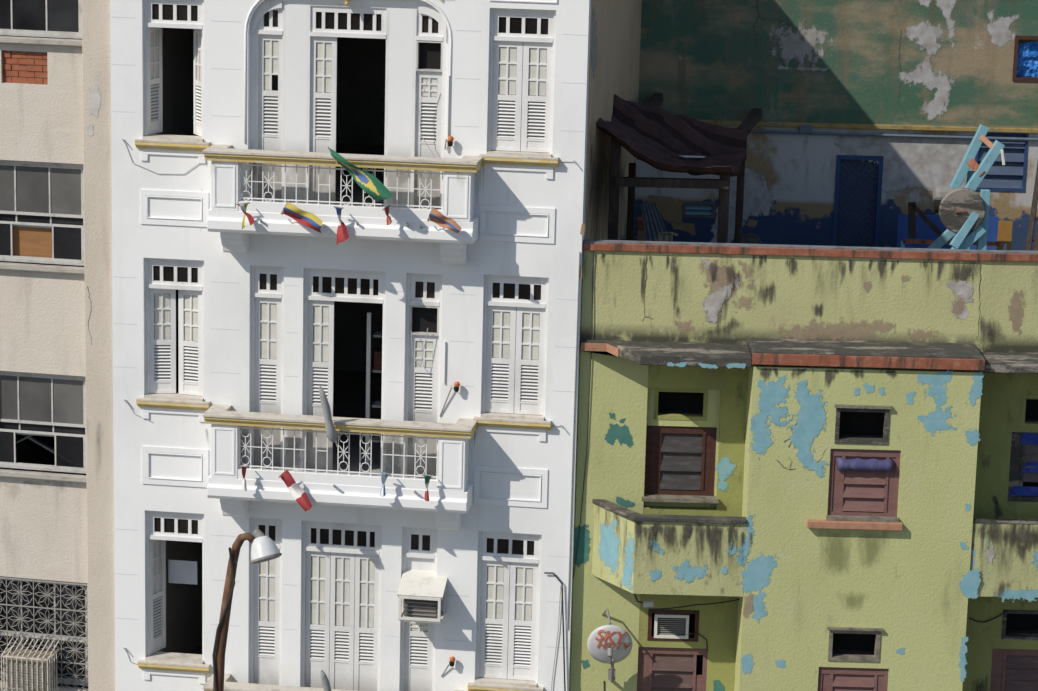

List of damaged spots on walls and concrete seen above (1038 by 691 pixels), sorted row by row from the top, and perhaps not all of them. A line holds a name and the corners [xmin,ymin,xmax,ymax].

flaking render [899,0,957,120]
flaking render [834,132,975,193]
damp [641,257,651,296]
damp [666,257,679,312]
damp [711,265,740,288]
damp [761,284,775,301]
damp [869,260,899,277]
damp [924,261,977,282]
peeling [605,413,634,447]
peeling [747,375,830,478]
peeling [906,370,984,448]
peeling [573,519,634,590]